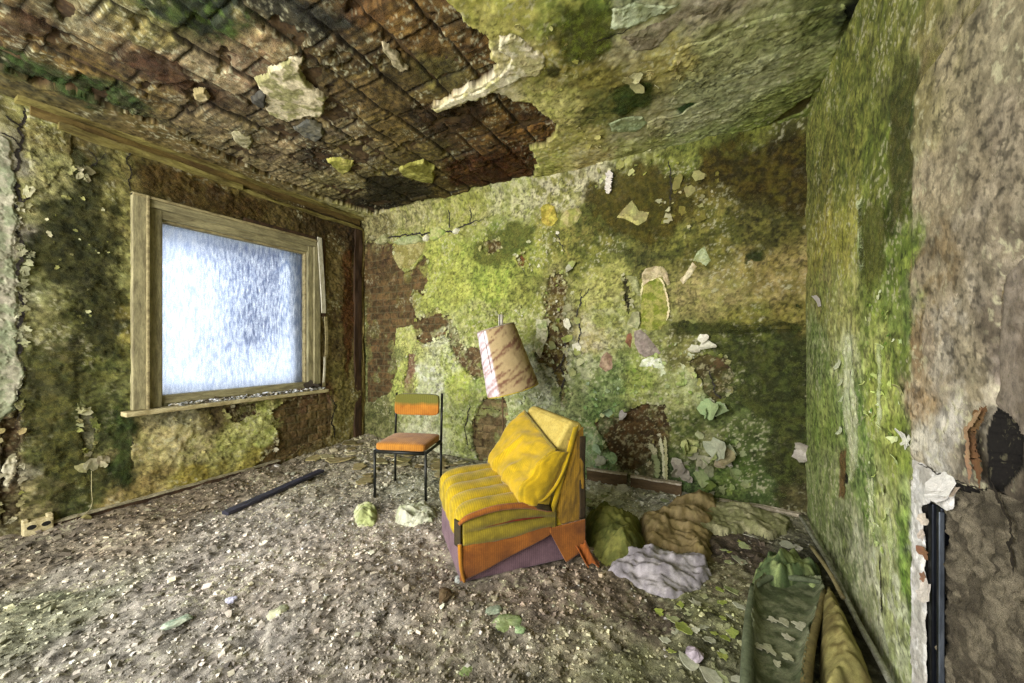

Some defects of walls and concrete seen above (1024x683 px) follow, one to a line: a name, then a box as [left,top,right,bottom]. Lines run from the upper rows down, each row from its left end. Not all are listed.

water stain [136,162,266,222]
crack [373,206,487,241]
water stain [415,100,494,137]
water stain [443,152,530,186]
peeling [431,24,563,113]
water stain [584,134,807,247]
water stain [16,148,131,501]
peeling [131,391,337,493]
flaking render [366,240,523,403]
flaking render [467,204,584,461]
flaking render [583,246,803,501]
water stain [671,320,807,497]